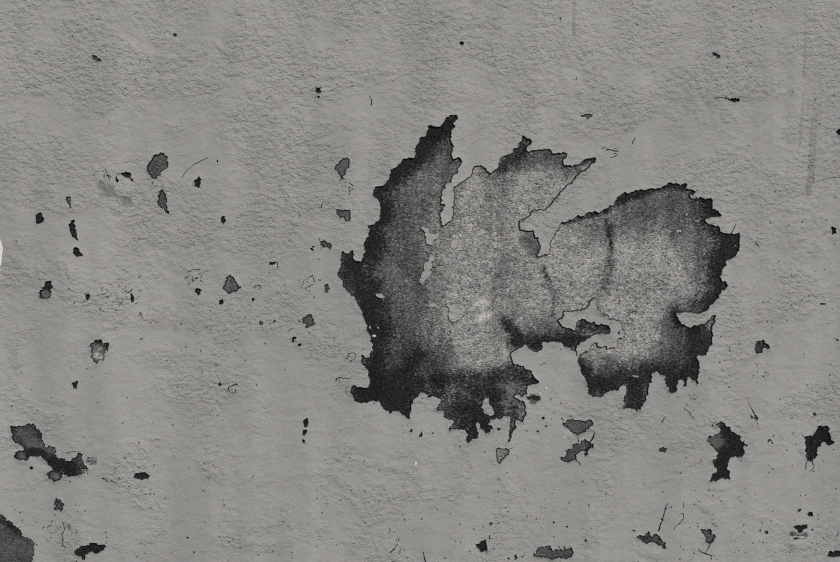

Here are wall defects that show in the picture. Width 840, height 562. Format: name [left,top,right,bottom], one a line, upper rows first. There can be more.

peeling [146,152,169,179]
peeling [157,189,169,215]
peeling [335,114,740,465]
peeling [10,423,97,483]
peeling [707,421,748,482]
peeling [802,412,835,472]
peeling [0,506,49,562]
peeling [41,498,69,512]
peeling [74,543,106,562]
peeling [507,545,574,560]
peeling [632,503,668,549]